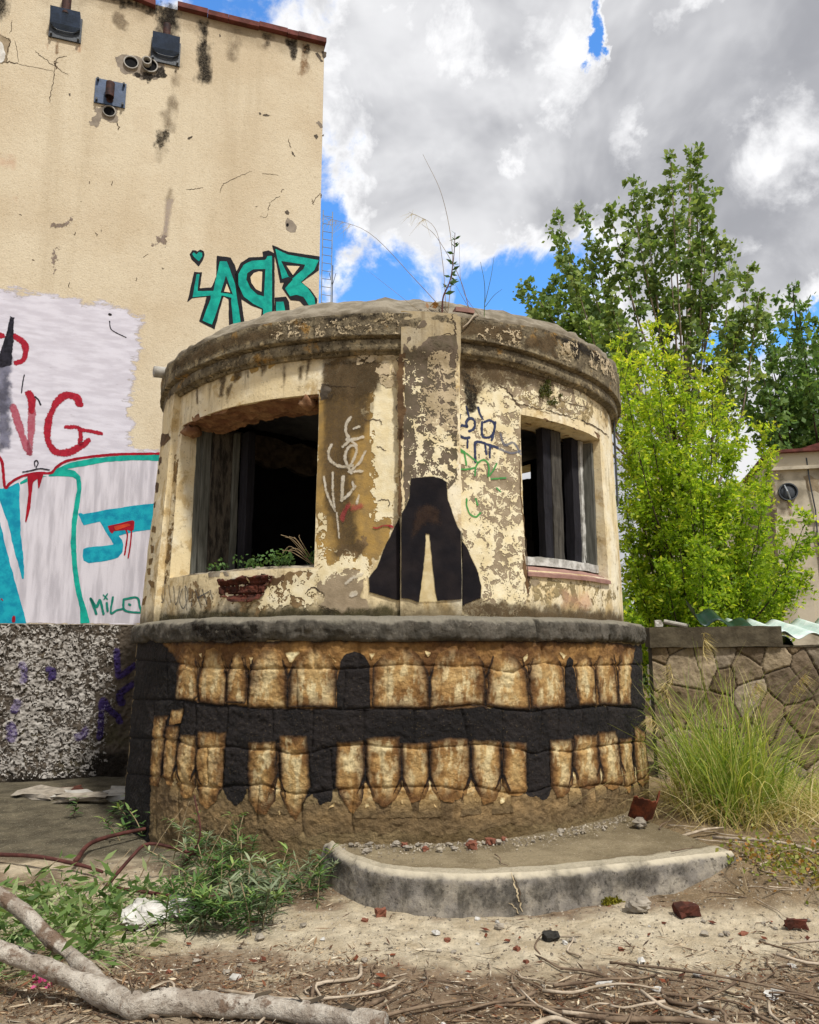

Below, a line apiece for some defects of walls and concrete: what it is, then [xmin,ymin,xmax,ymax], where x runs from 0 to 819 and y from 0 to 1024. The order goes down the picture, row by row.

crack [2,22,67,102]
water stain [197,21,211,83]
peeling [188,312,618,617]